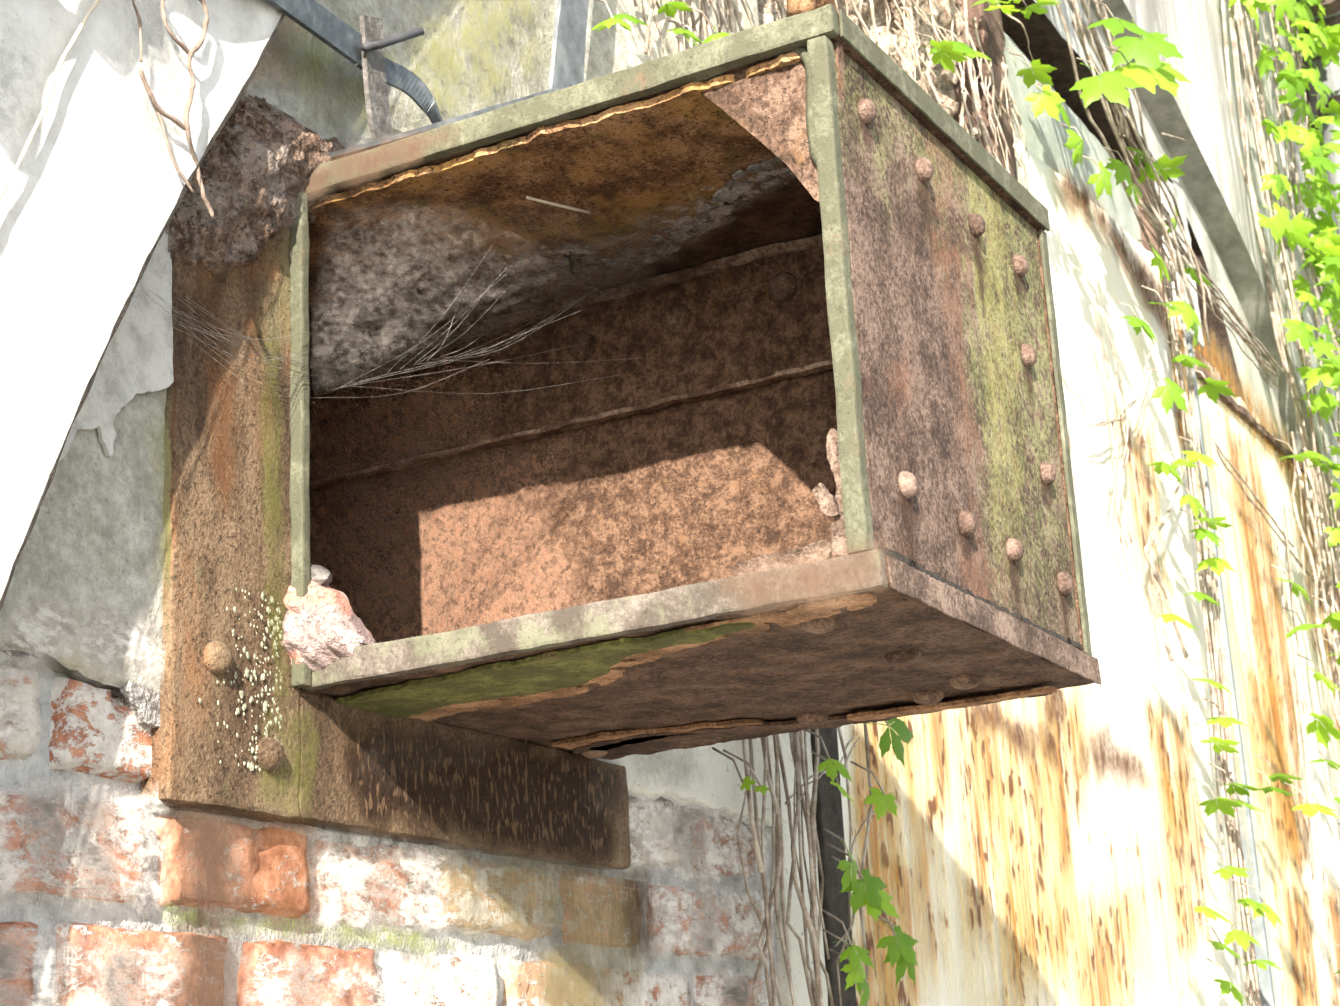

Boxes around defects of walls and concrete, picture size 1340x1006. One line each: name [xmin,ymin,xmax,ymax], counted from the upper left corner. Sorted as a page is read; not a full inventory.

rust [973,235,984,294]
peeling [59,223,174,461]
rust [1021,343,1033,398]
rust [1010,559,1020,608]
rust [1059,173,1340,1006]
flaking render [0,603,165,738]
peeling [0,787,166,899]
peeling [0,935,180,1006]
water stain [165,805,244,1006]
rust [349,593,1211,1006]